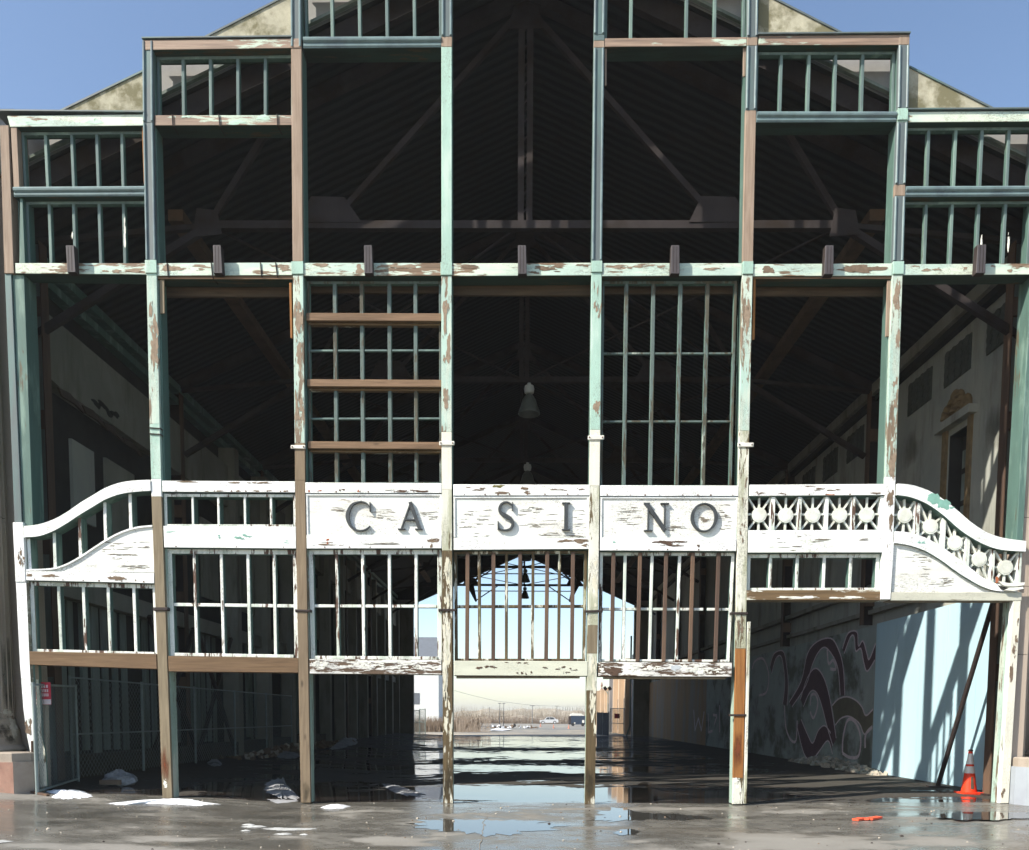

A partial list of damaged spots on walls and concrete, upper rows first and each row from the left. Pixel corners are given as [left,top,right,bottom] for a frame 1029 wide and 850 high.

peeling [162,264,211,272]
peeling [893,279,901,310]
peeling [149,302,159,372]
peeling [293,301,303,372]
peeling [442,300,451,364]
peeling [294,389,305,428]
peeling [872,437,897,531]
peeling [927,493,954,510]
peeling [652,540,700,548]
peeling [683,664,723,674]